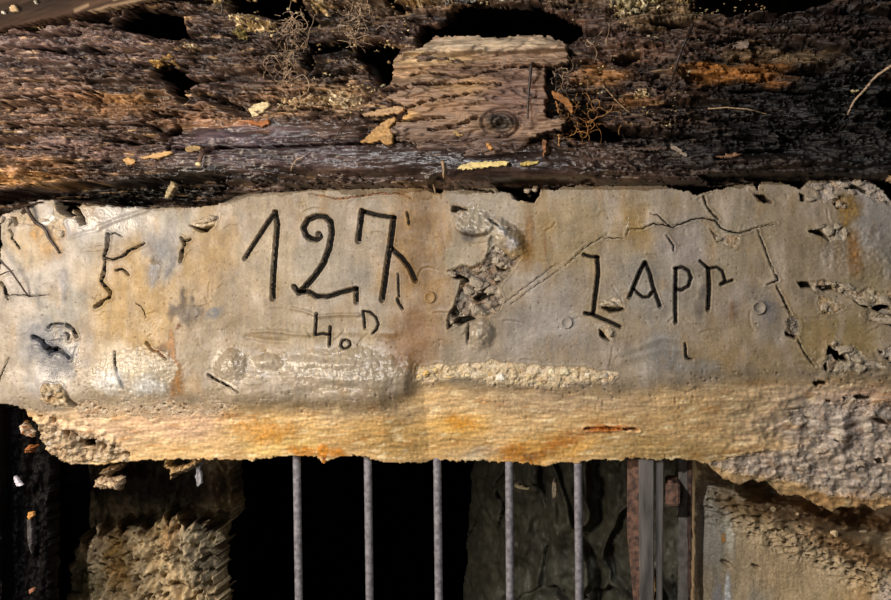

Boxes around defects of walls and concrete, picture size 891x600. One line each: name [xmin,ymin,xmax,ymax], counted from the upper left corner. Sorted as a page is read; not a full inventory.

spalling [445,246,523,330]
crack [501,199,790,312]
spalling [804,280,891,324]
spalling [815,341,891,388]
spalling [35,421,131,465]
spalling [703,394,891,501]